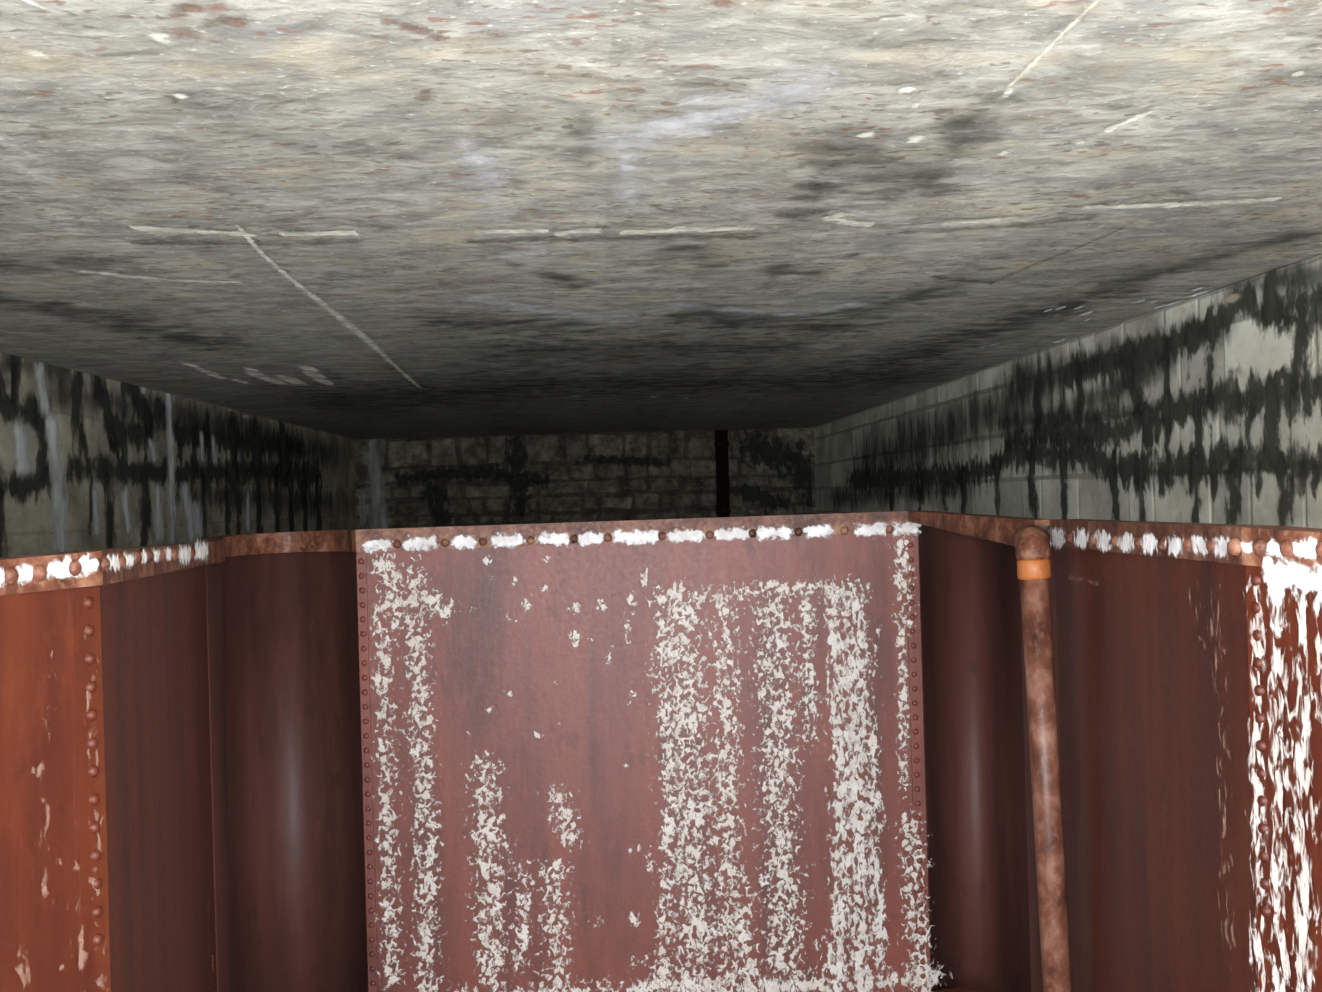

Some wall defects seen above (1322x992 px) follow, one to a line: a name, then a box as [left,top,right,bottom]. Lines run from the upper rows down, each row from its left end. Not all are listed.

rust [171,4,247,39]
rust [381,18,448,41]
damp [80,270,240,283]
damp [112,315,223,350]
damp [235,225,1322,992]